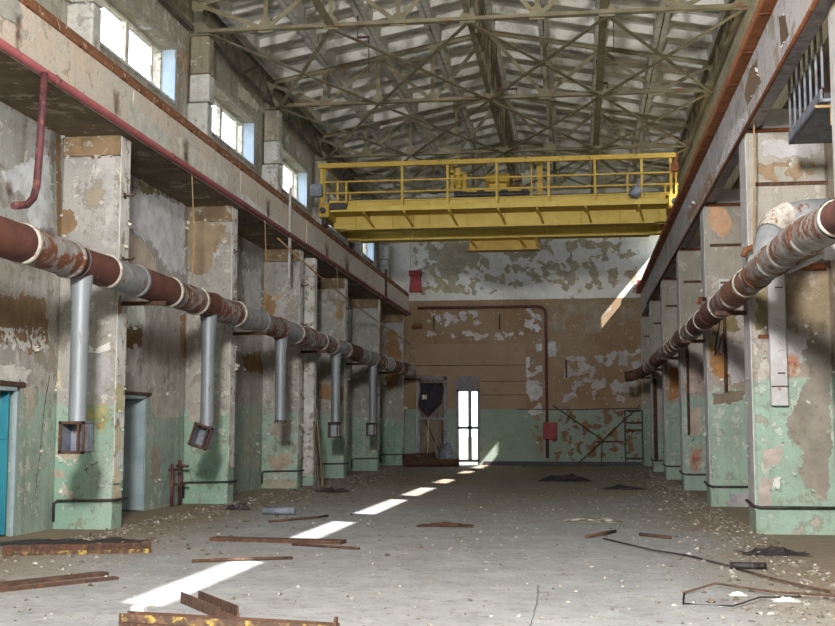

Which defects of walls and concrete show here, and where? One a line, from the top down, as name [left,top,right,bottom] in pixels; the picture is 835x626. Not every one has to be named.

peeling [0,363,37,425]
peeling [0,290,51,355]
peeling [91,155,227,275]
peeling [414,238,639,296]
peeling [427,302,641,461]
peeling [759,314,835,510]